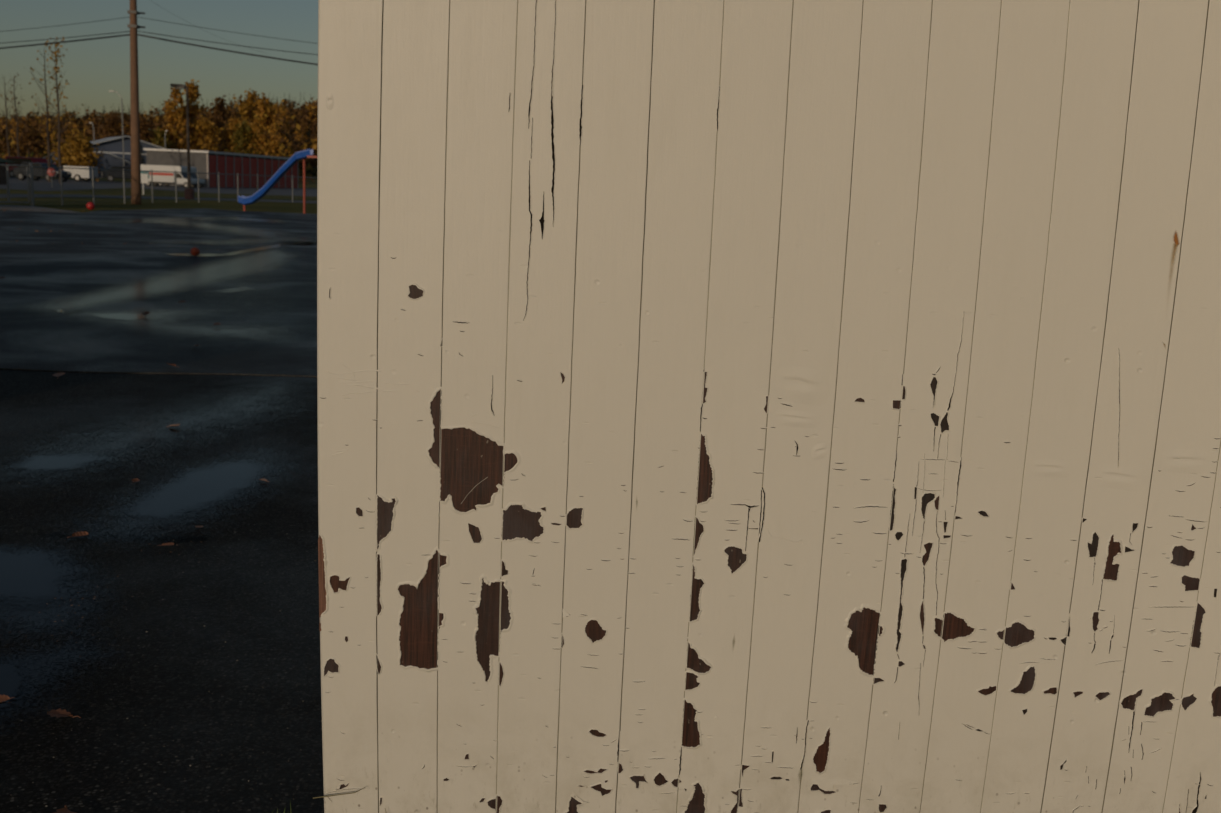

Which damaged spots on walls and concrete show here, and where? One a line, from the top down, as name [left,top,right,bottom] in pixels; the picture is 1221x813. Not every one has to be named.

crack [508,0,584,321]
peeling [355,494,450,673]
peeling [472,559,514,687]
peeling [426,387,585,544]
peeling [680,637,713,749]
peeling [688,432,715,623]
peeling [843,482,977,685]
peeling [995,613,1071,649]
peeling [976,665,1221,719]
peeling [1169,544,1218,649]
peeling [563,762,708,813]
peeling [809,726,837,813]